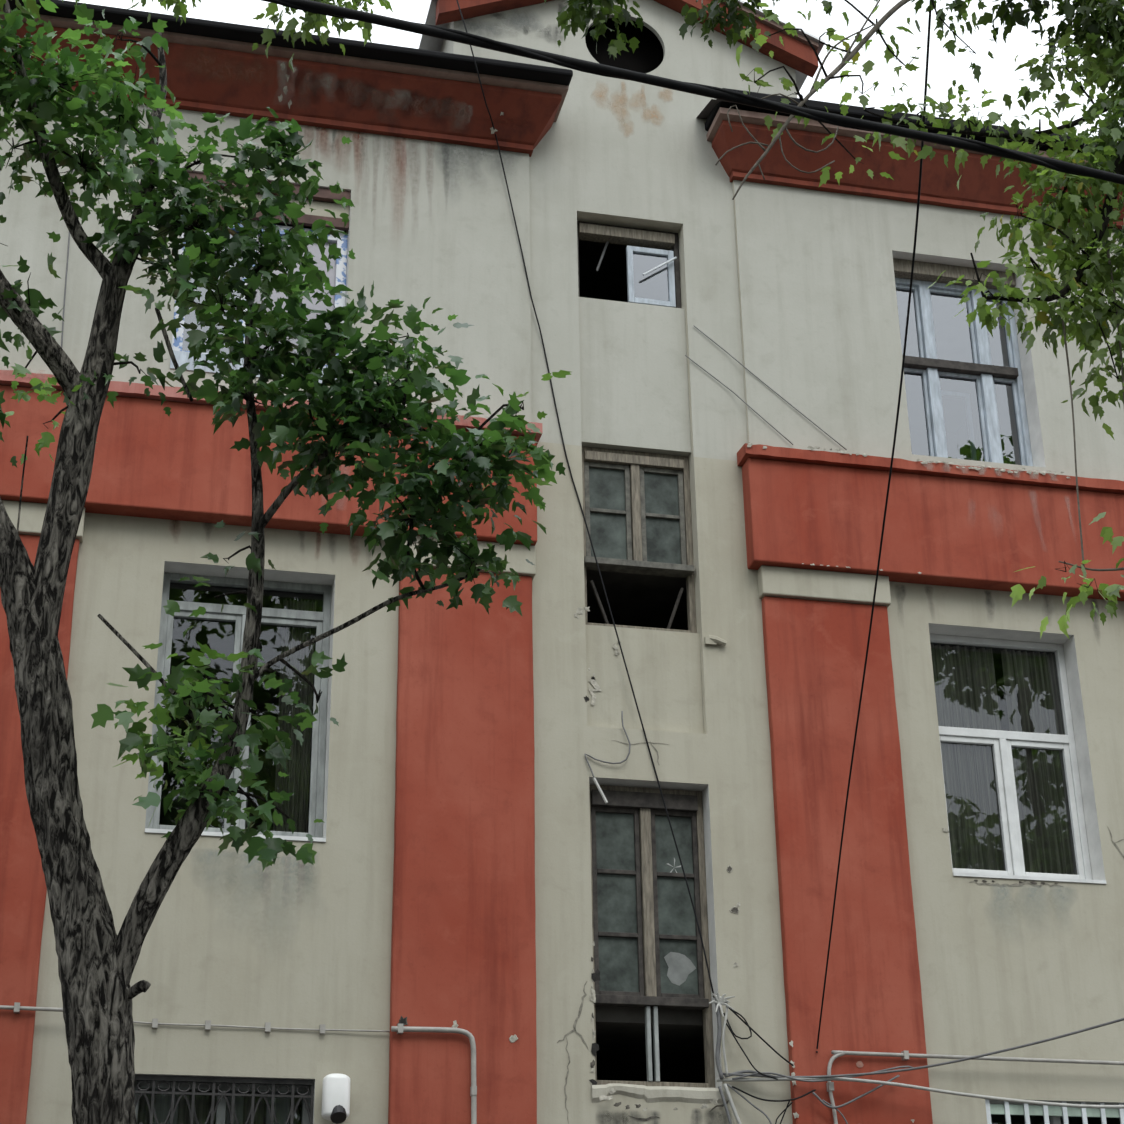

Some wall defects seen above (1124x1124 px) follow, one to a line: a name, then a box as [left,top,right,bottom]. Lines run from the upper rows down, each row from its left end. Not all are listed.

crack [557,981,588,1124]